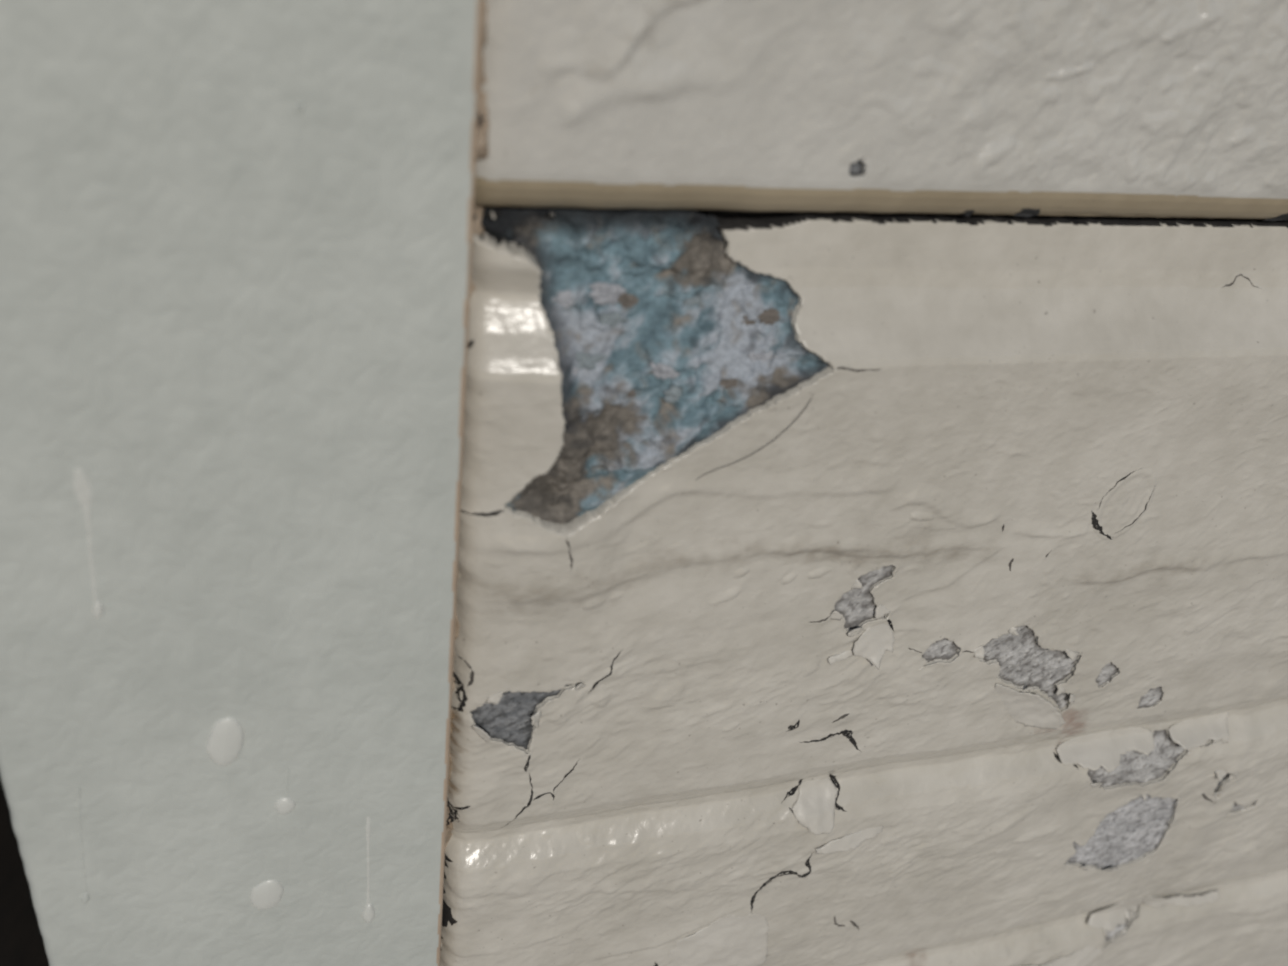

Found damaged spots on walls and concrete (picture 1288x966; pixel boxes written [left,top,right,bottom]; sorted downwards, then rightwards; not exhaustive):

peeling [481,206,837,524]
crack [1091,470,1154,540]
peeling [827,563,898,670]
crack [590,651,621,692]
peeling [467,680,587,757]
peeling [916,622,1229,873]
crack [505,755,580,826]
crack [750,854,812,913]